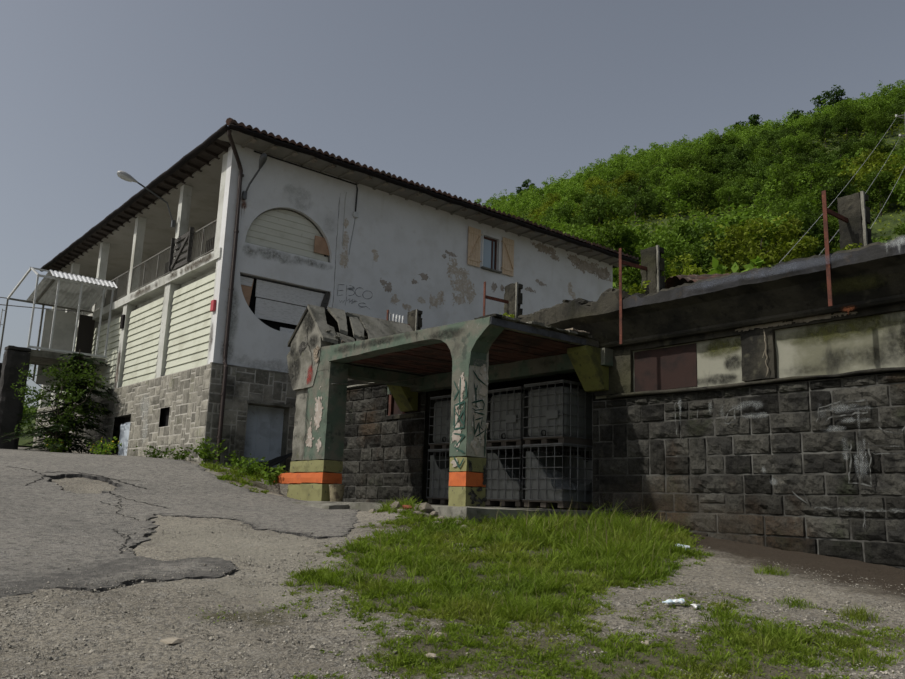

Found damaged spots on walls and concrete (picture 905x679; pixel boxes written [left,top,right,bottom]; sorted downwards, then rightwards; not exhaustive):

peeling [380,250,476,311]
peeling [305,386,323,452]